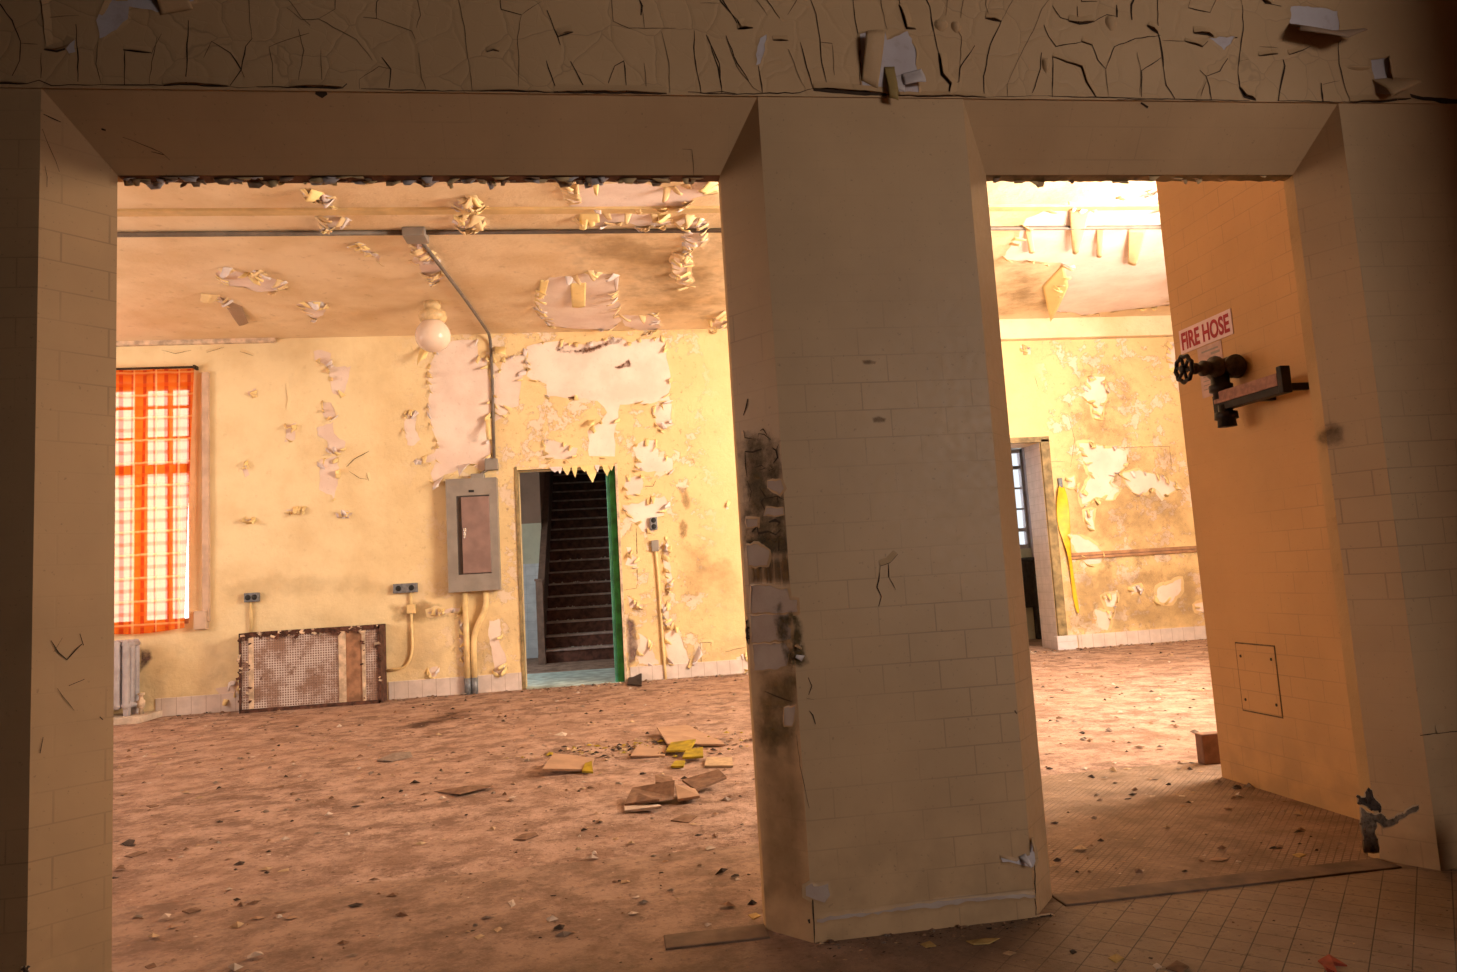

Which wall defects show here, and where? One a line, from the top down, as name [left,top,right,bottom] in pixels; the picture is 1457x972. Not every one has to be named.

crack [0,0,1457,175]
peeling [199,266,332,326]
peeling [119,176,720,291]
peeling [986,175,1292,321]
peeling [1163,338,1176,376]
peeling [400,269,703,679]
damp [744,438,787,553]
peeling [1062,439,1185,569]
peeling [722,477,805,674]
peeling [1091,545,1204,633]
damp [762,613,805,745]
spalling [1356,787,1419,854]